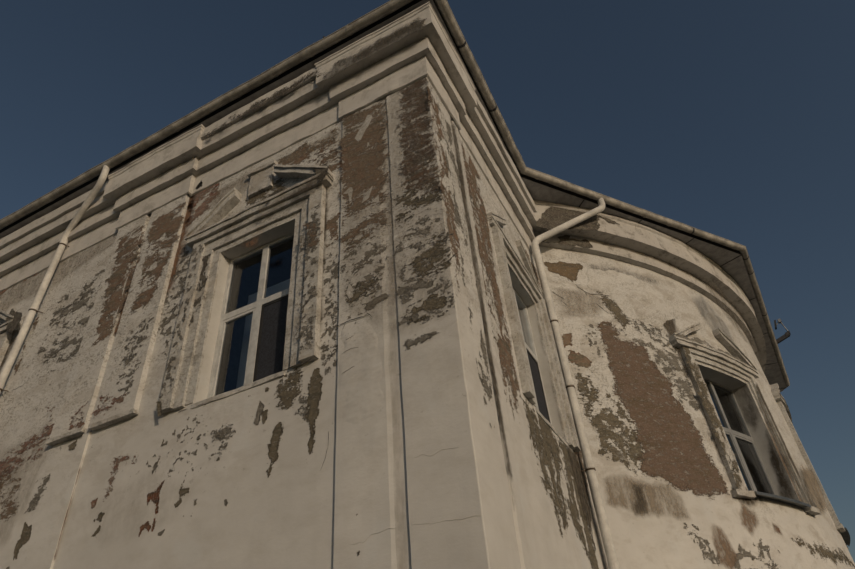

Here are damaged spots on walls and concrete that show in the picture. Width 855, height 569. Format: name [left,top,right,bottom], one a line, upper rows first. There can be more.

spalling [536,206,620,248]
peeling [33,183,226,430]
peeling [254,78,600,569]
spalling [562,291,755,500]
peeling [0,407,55,569]
peeling [91,417,236,537]
peeling [684,523,720,566]
peeling [734,539,781,569]
peeling [792,538,855,567]